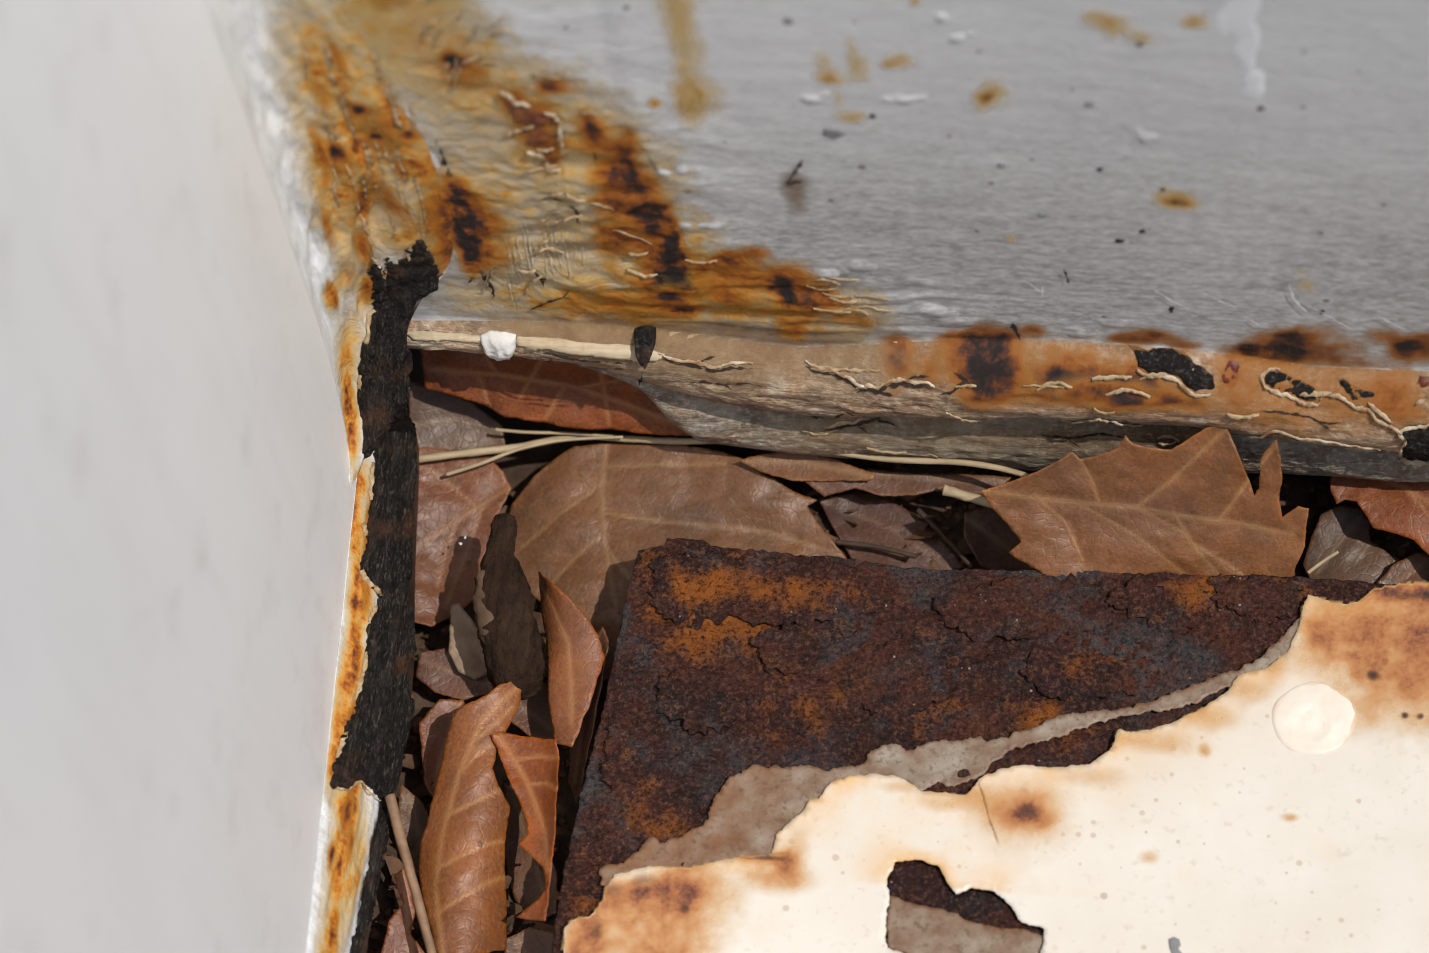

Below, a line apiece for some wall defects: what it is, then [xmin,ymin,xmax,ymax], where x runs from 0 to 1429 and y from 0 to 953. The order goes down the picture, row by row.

rust [1087,13,1148,40]
rust [975,87,1003,108]
rust [1157,191,1196,209]
crack [638,352,766,391]
crack [805,360,996,432]
rust [880,324,1429,427]
crack [1043,418,1151,448]
crack [1230,410,1381,451]
rust [274,0,887,953]
rust [1299,582,1429,725]
spalling [552,538,1397,953]
rust [958,788,1059,834]